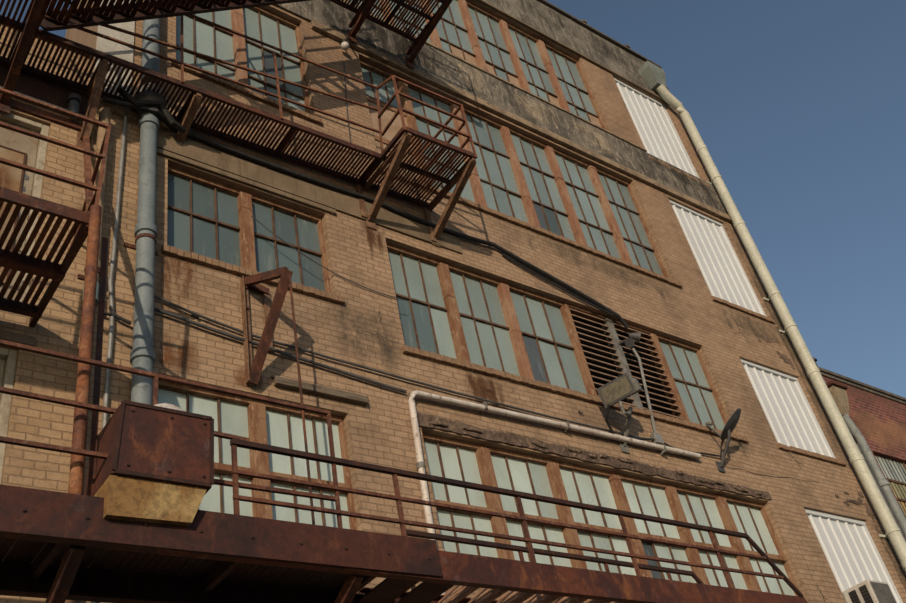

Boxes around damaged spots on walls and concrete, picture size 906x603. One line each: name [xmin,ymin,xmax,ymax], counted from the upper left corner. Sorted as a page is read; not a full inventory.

spalling [835,491,881,534]